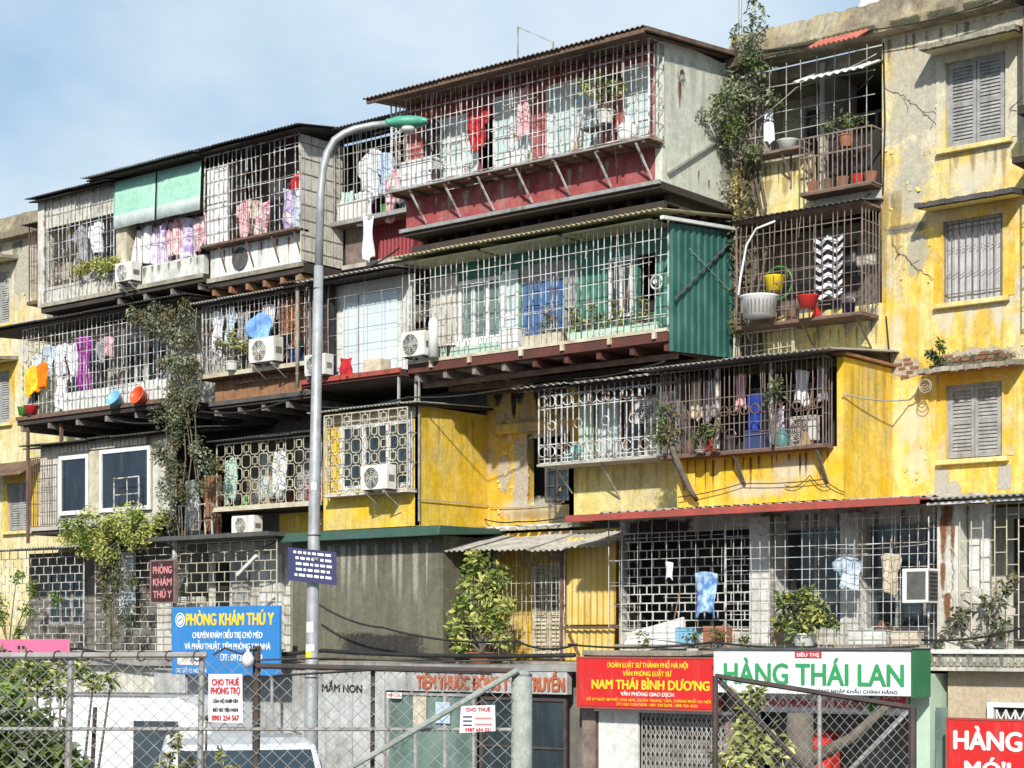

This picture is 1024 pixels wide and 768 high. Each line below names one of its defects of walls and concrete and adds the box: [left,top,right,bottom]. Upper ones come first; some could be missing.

crack [885,88,936,131]
crack [883,224,930,277]
spalling [886,342,1024,380]
spalling [487,412,571,531]
corrosion [940,506,955,621]
leakage [343,633,425,655]